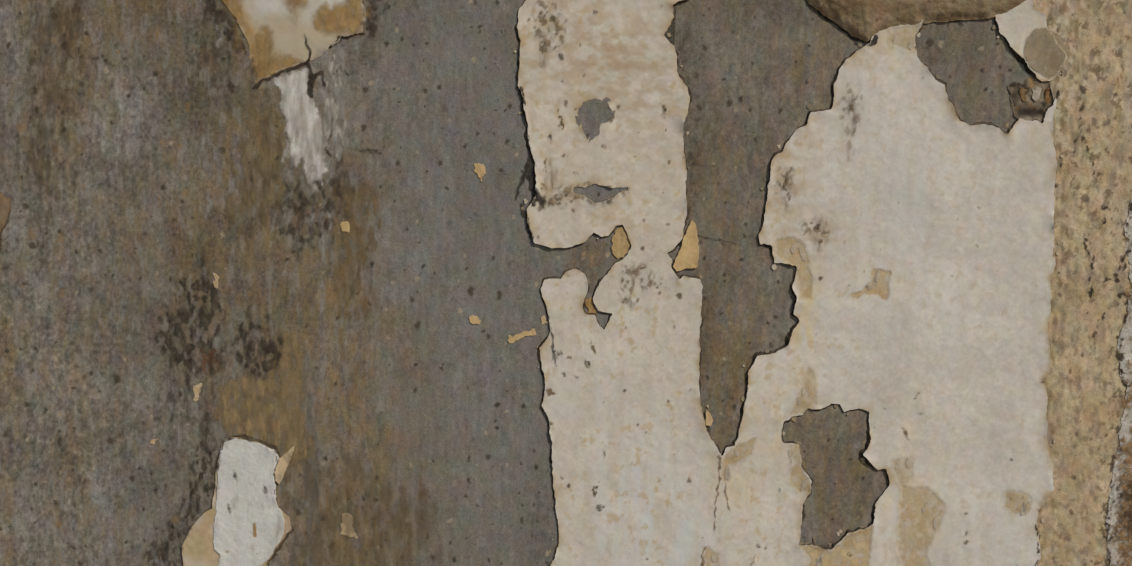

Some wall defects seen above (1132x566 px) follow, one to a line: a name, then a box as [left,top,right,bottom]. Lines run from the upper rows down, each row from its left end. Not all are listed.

leakage [145,278,316,566]
peeling [0,0,645,566]
peeling [664,0,872,480]
peeling [781,404,910,566]
peeling [892,0,1132,566]